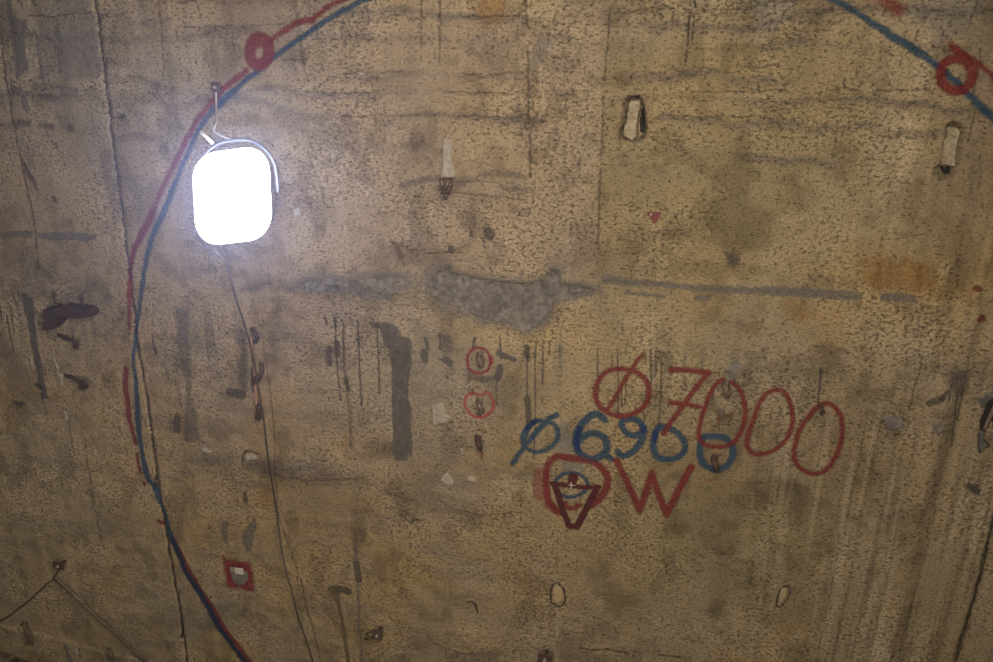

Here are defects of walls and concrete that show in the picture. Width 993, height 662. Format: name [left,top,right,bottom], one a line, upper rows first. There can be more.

crack [94,0,188,662]
crack [955,522,993,662]